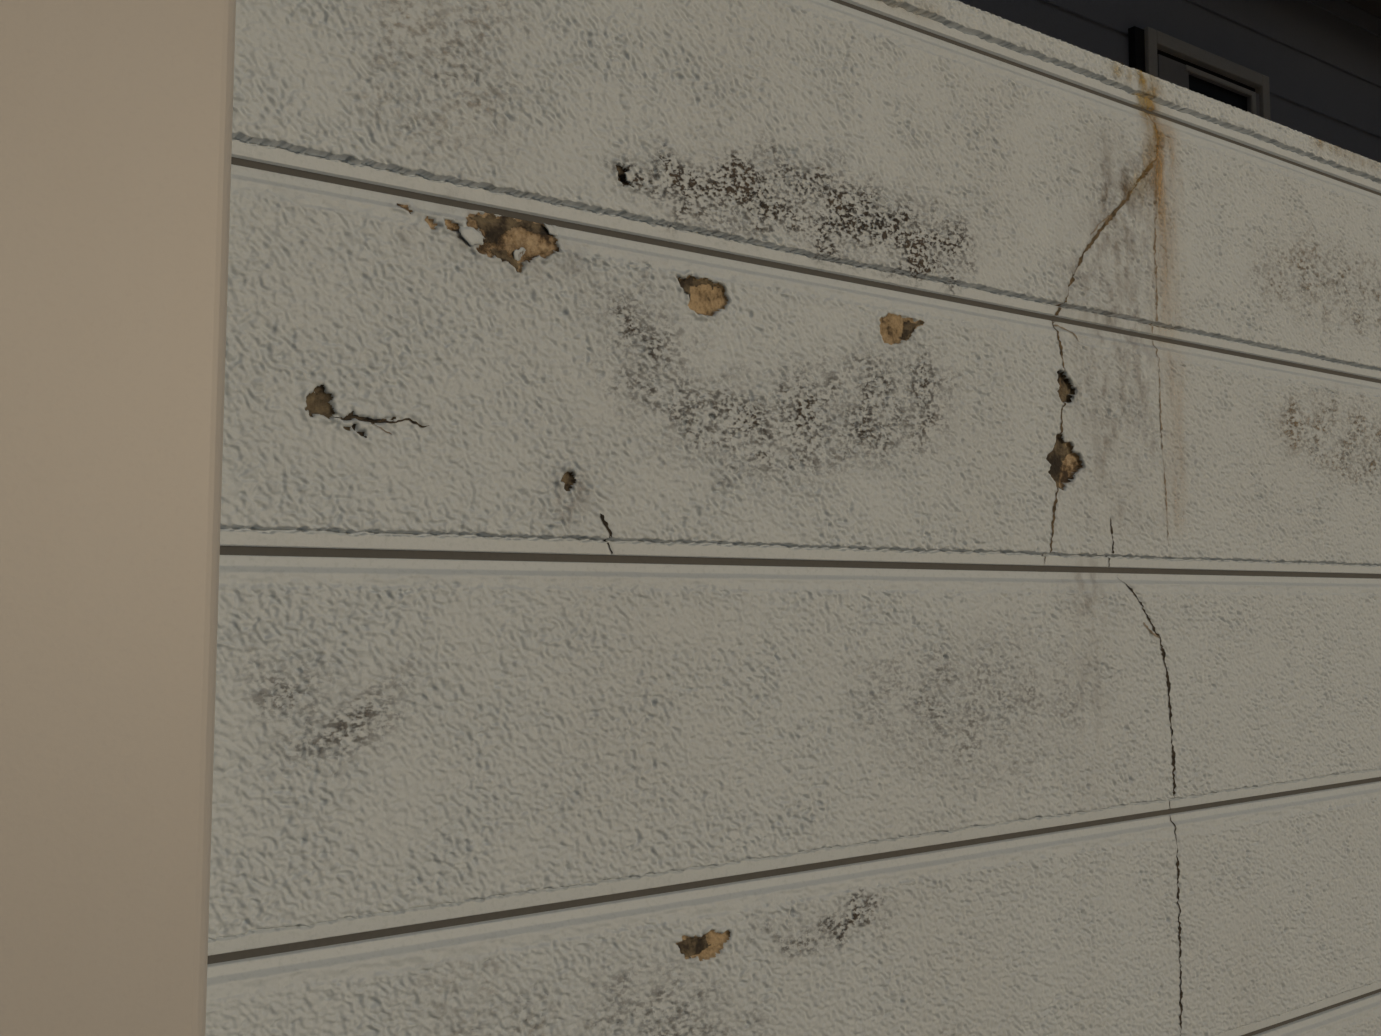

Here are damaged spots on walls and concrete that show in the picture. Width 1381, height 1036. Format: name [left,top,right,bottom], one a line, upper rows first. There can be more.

spalling [397,203,559,275]
damp [619,152,969,288]
spalling [676,275,728,316]
spalling [879,313,925,345]
crack [1052,105,1169,545]
spalling [1057,371,1075,403]
crack [330,415,429,435]
spalling [1046,434,1083,490]
crack [1042,488,1059,564]
crack [1106,518,1183,1029]
spalling [676,930,730,961]